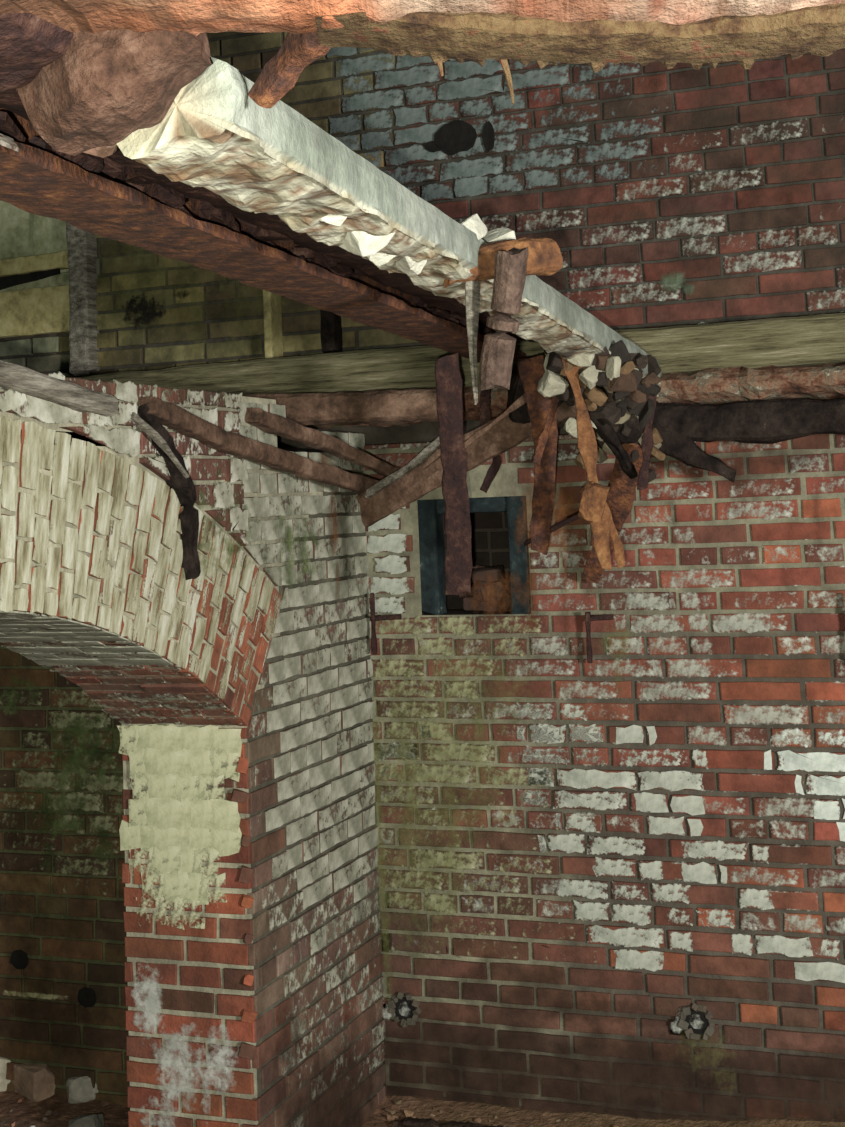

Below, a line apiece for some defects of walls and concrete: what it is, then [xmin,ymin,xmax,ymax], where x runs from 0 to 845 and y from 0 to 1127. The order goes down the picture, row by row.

peeling [664,148,759,190]
peeling [592,216,837,272]
peeling [563,264,678,308]
spalling [656,363,845,405]
peeling [0,379,845,1099]
spalling [0,1057,104,1127]